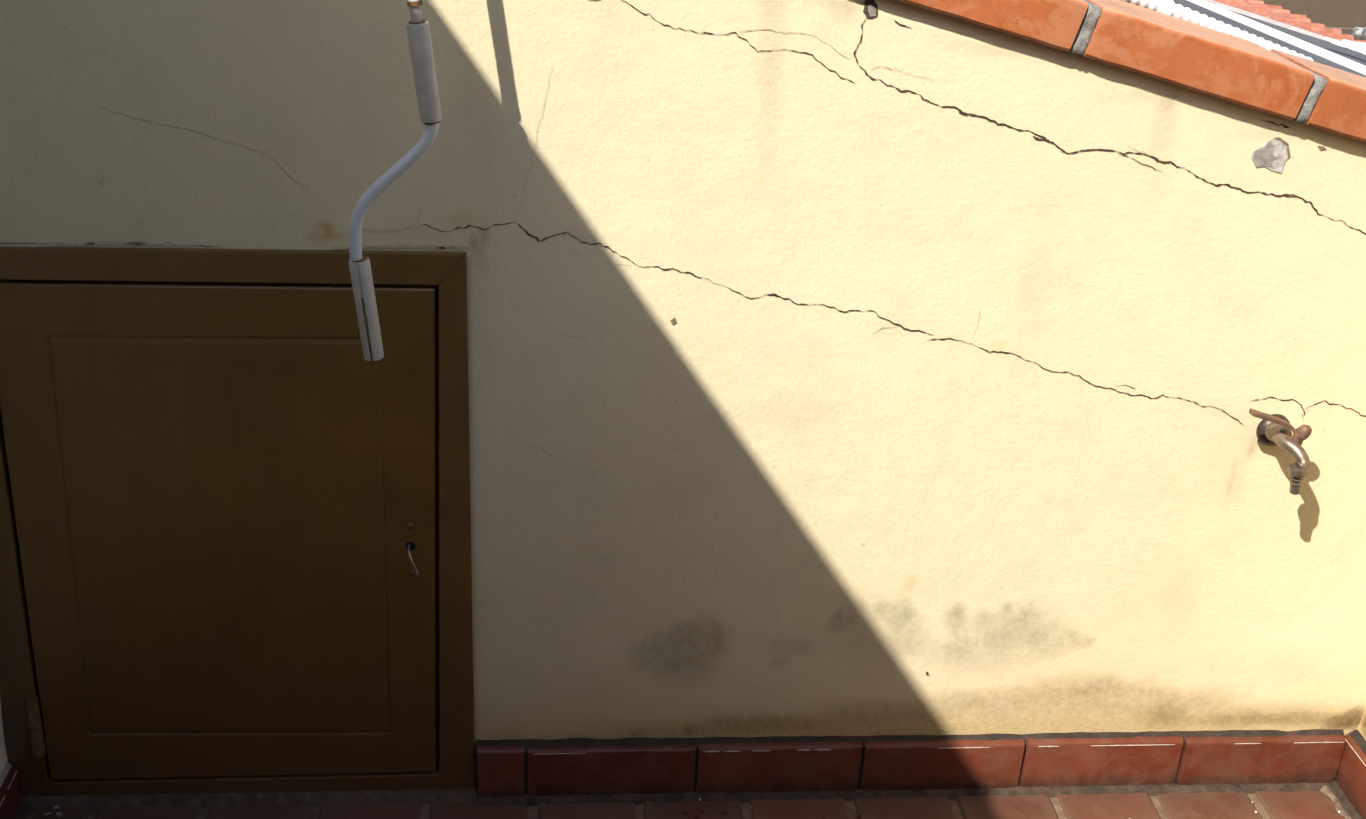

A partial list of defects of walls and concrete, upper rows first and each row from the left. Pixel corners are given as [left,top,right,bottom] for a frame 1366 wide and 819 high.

crack [312,70,1366,426]
crack [621,0,1366,234]
peeling [1251,137,1290,173]
damp [1335,712,1366,727]